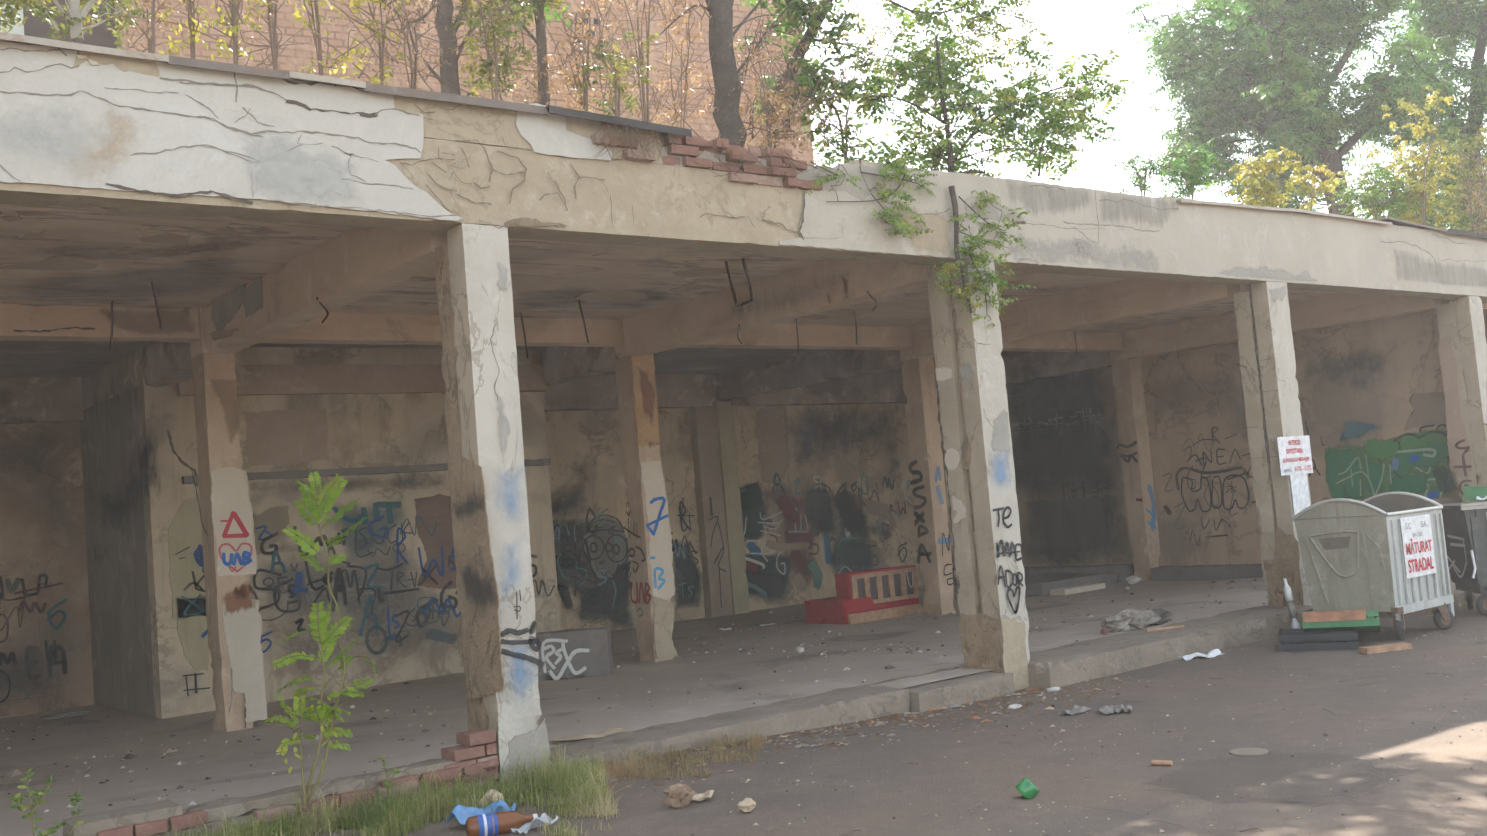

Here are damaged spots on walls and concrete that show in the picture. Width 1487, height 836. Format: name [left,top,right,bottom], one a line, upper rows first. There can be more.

crack [0,42,634,256]
flaking render [591,133,879,201]
crack [700,191,843,241]
crack [481,285,500,401]
flaking render [935,367,952,382]
flaking render [944,441,971,470]
flaking render [952,496,967,524]
flaking render [168,467,290,723]
flaking render [960,613,1029,709]